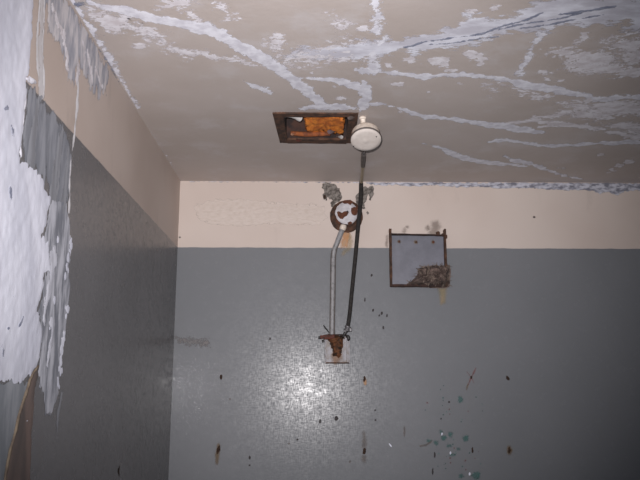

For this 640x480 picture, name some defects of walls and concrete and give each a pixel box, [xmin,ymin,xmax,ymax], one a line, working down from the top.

peeling [153,0,204,23]
peeling [210,1,243,22]
peeling [45,0,194,109]
peeling [260,0,640,79]
peeling [246,82,273,95]
peeling [497,82,640,134]
corrosion [303,117,345,135]
peeling [318,182,640,214]
flaking render [0,0,73,480]